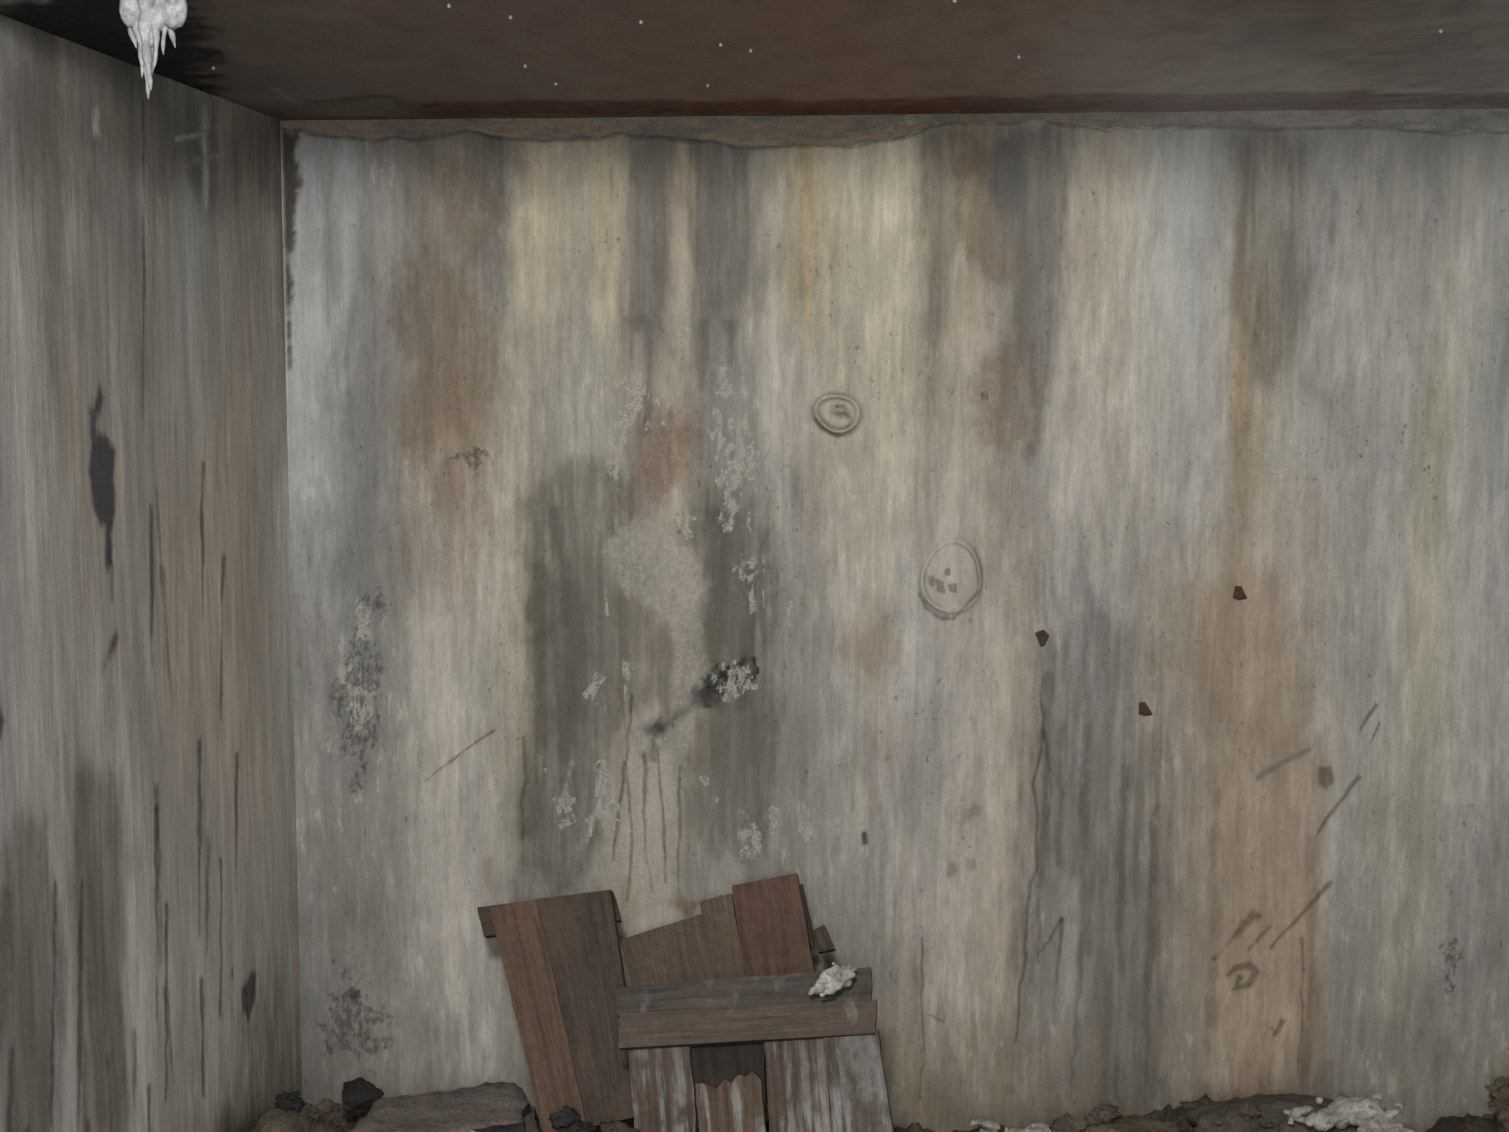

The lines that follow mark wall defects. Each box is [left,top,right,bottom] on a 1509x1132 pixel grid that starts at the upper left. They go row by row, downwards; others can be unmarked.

damp [0,0,221,209]